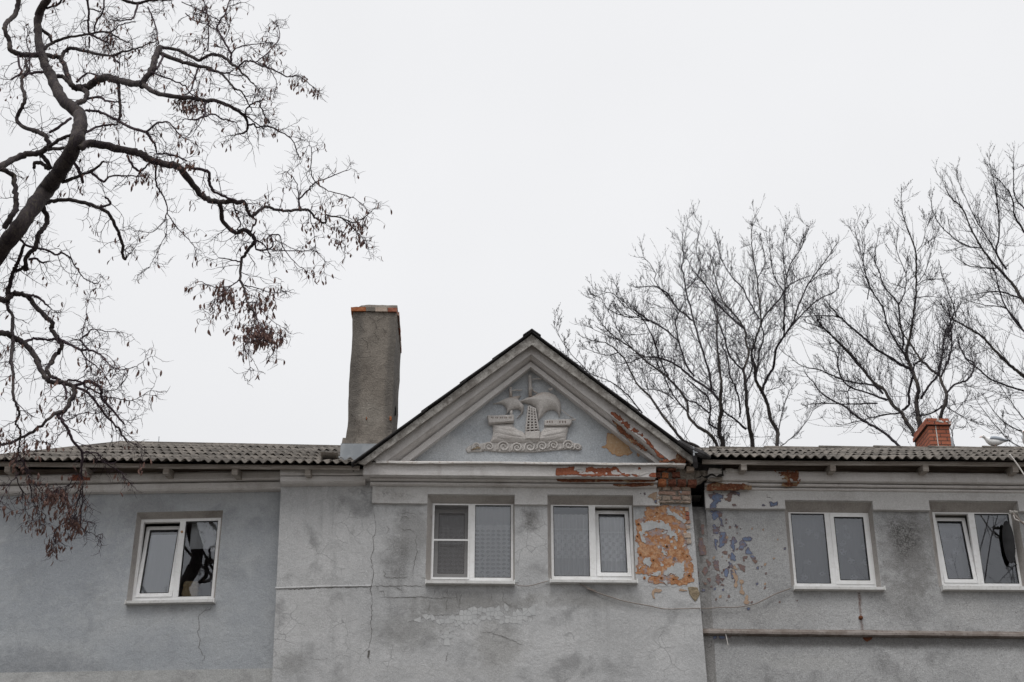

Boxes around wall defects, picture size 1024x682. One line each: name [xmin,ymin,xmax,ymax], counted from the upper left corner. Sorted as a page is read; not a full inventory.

crack [290,512,536,661]
peeling [556,433,786,610]